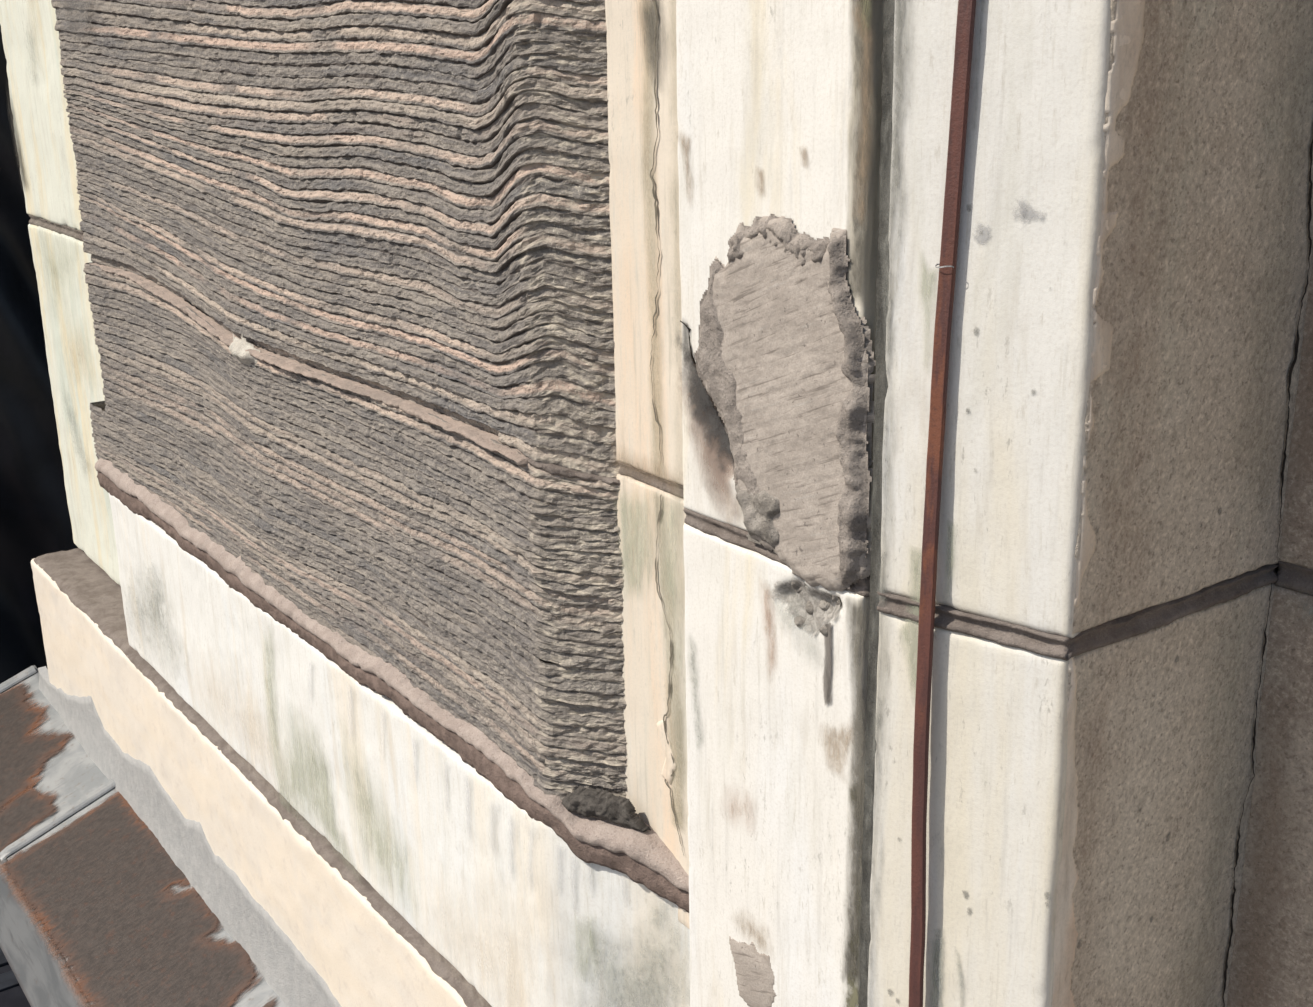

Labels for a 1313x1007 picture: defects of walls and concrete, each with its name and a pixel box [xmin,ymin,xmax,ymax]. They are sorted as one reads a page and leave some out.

crack [649,0,661,455]
corrosion [0,684,260,1007]
crack [655,495,684,855]
crack [1222,140,1313,1007]